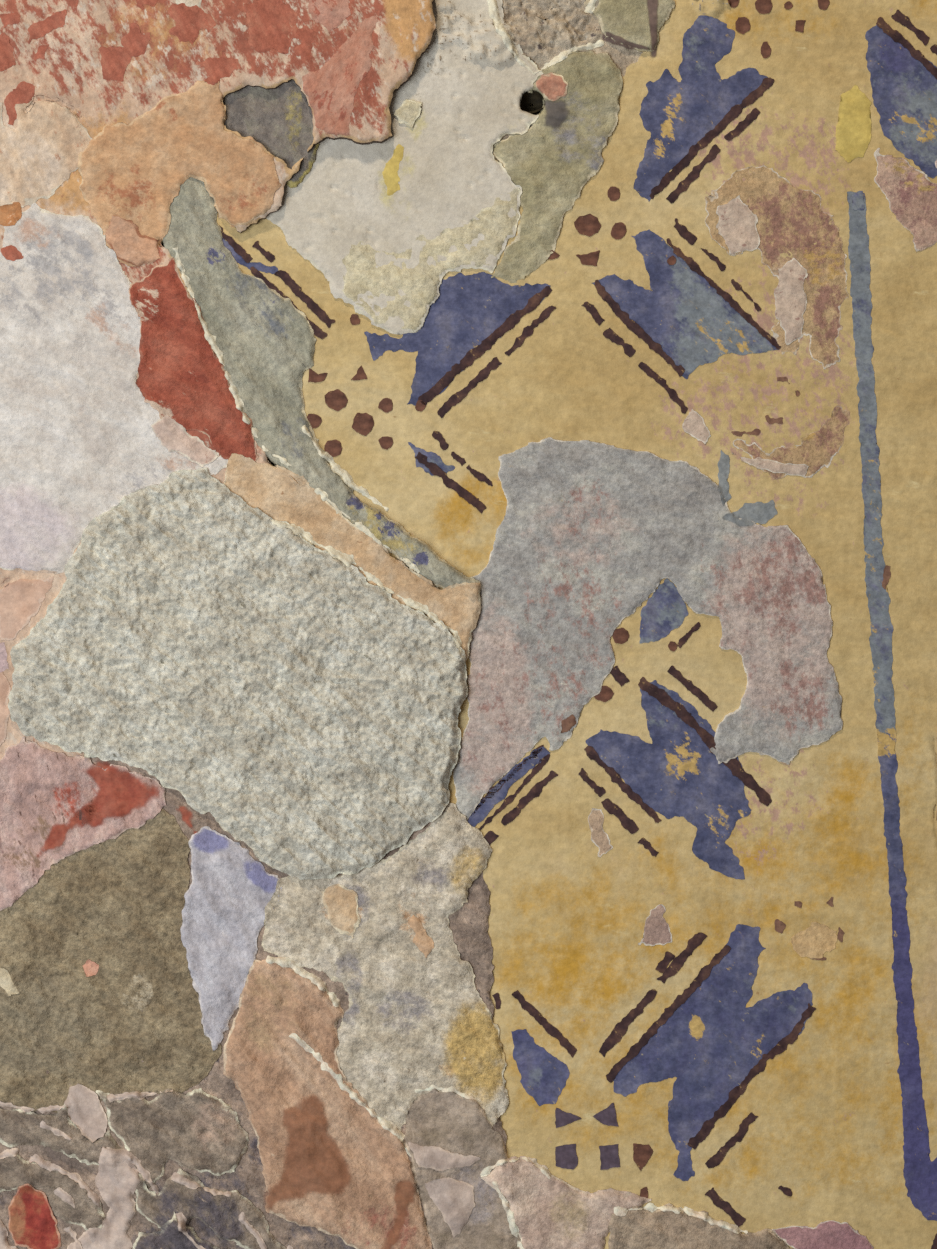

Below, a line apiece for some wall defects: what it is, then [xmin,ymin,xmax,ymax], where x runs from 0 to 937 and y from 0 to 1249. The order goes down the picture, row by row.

spalling [593,0,675,52]
peeling [874,148,937,252]
peeling [705,165,849,369]
peeling [0,0,643,746]
peeling [682,409,711,444]
peeling [731,405,850,479]
peeling [882,565,891,589]
peeling [0,437,874,1249]